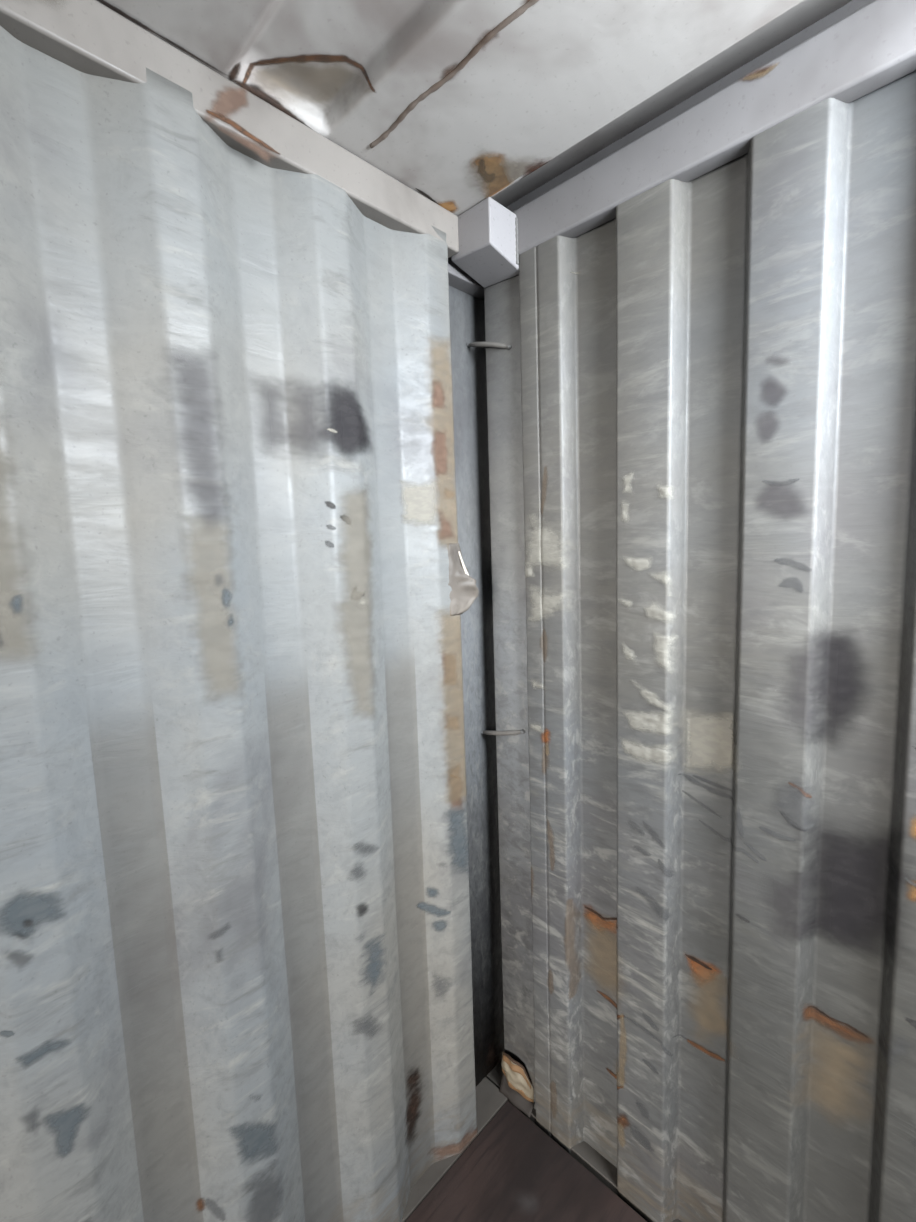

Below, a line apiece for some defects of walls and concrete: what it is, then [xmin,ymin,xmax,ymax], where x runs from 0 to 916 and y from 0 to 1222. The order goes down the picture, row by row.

corrosion [98,0,375,159]
corrosion [474,155,510,197]
damp [819,637,863,732]
damp [810,833,899,947]
corrosion [585,907,617,932]
corrosion [685,954,719,983]
corrosion [804,1006,870,1042]